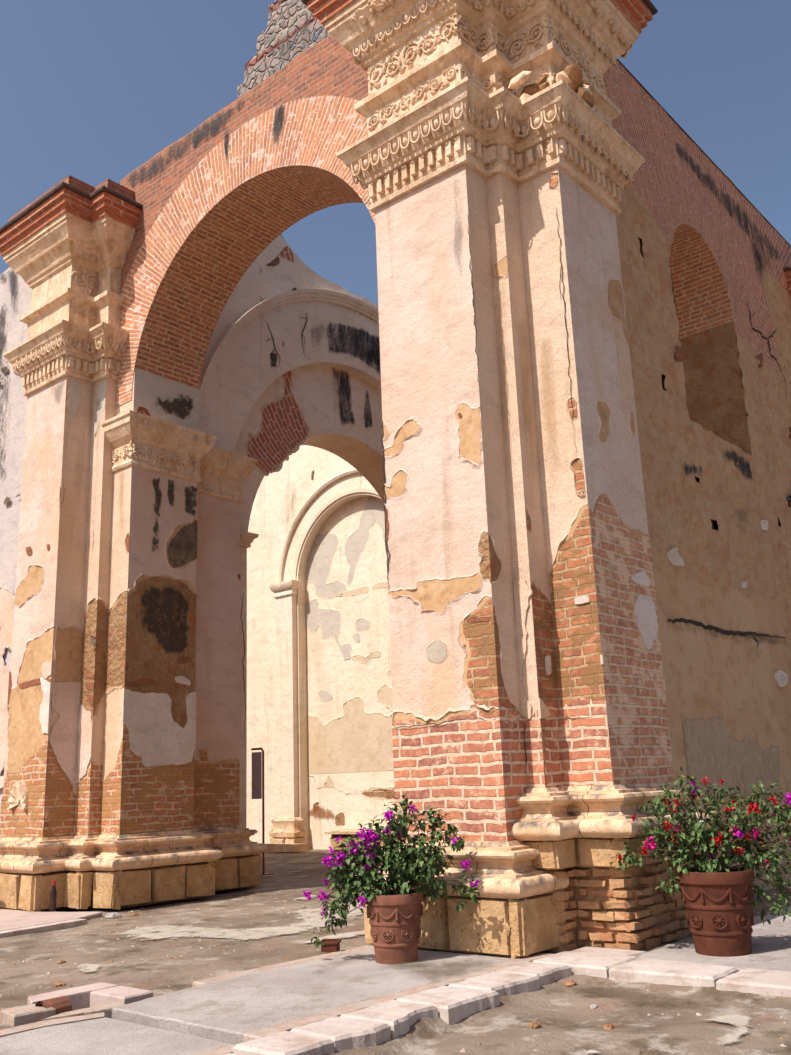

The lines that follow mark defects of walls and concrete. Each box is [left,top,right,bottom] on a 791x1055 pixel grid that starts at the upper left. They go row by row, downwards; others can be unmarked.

damp [273,106,284,140]
damp [327,323,381,374]
crack [468,218,482,406]
crack [556,207,577,462]
damp [156,394,193,419]
flaking render [244,370,311,476]
flaking render [454,401,483,469]
flaking render [0,516,240,838]
damp [141,585,189,654]
flaking render [305,416,786,842]